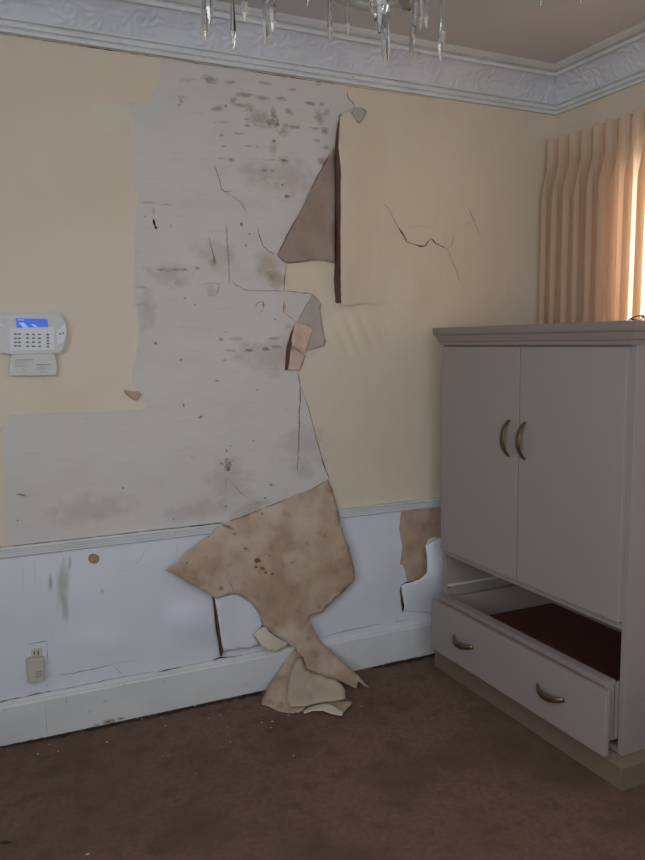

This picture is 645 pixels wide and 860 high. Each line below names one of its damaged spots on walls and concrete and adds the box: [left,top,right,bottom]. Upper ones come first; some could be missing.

crack [385,205,459,278]
peeling [1,58,369,688]
peeling [399,507,441,581]
crack [1,665,130,702]